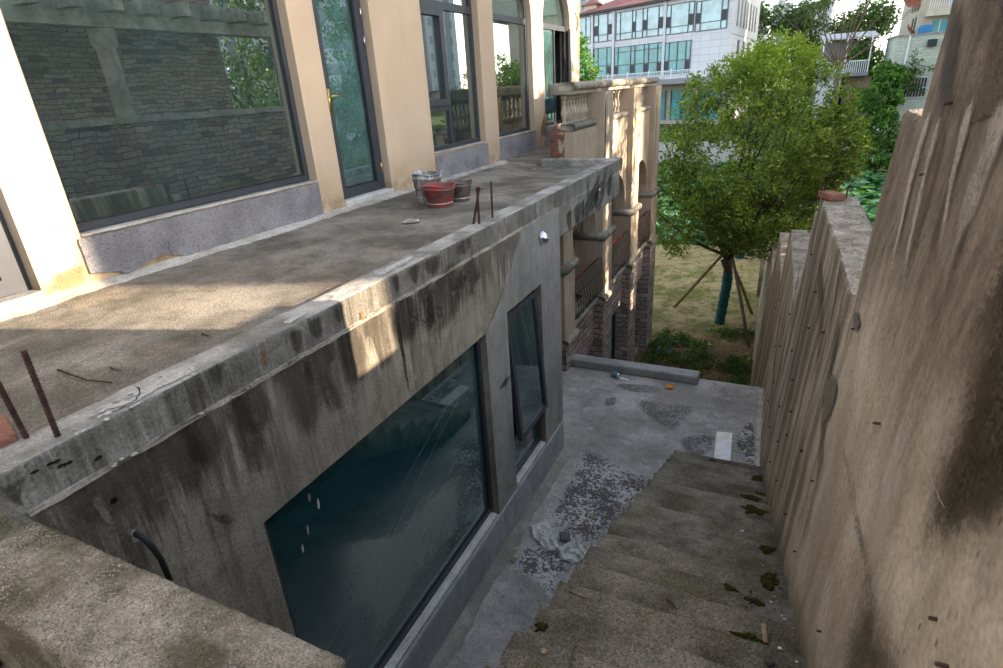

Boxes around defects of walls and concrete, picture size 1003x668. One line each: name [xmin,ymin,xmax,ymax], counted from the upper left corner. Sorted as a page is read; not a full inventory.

leakage [895,6,960,256]
leakage [932,0,1003,240]
leakage [68,415,221,521]
spalling [27,207,558,517]
leakage [926,268,1003,537]